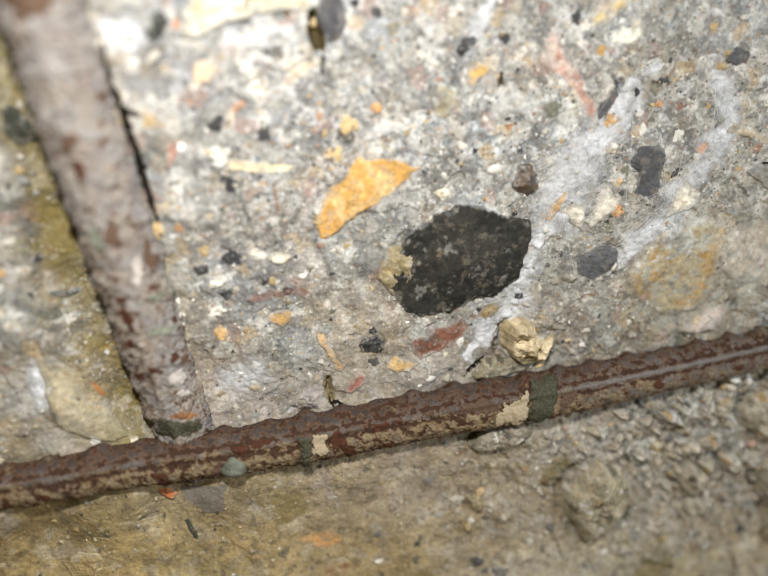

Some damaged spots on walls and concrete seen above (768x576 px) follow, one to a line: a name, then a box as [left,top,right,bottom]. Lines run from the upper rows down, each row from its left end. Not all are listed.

crack [101,43,158,221]
rust [170,352,189,366]
spalling [222,366,262,386]
spalling [323,374,336,403]
peeling [471,354,533,380]
rust [331,429,359,457]
rust [150,473,174,486]